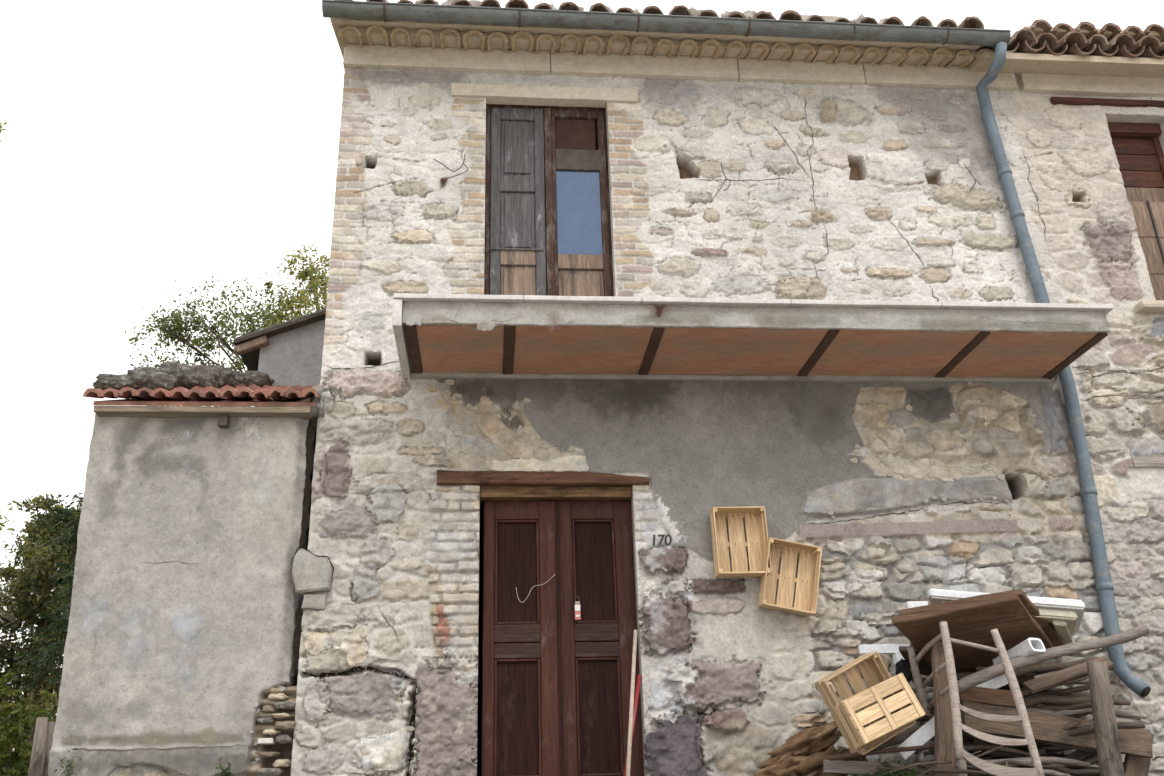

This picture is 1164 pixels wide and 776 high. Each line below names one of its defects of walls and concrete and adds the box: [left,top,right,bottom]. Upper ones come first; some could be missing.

crack [692,98,829,278]
crack [888,218,939,301]
flaking render [430,380,589,472]
flaking render [804,382,1044,519]
peeling [419,524,478,595]
peeling [301,594,326,610]
flaking render [303,626,367,668]
peeling [451,648,476,685]
flaking render [359,726,415,776]